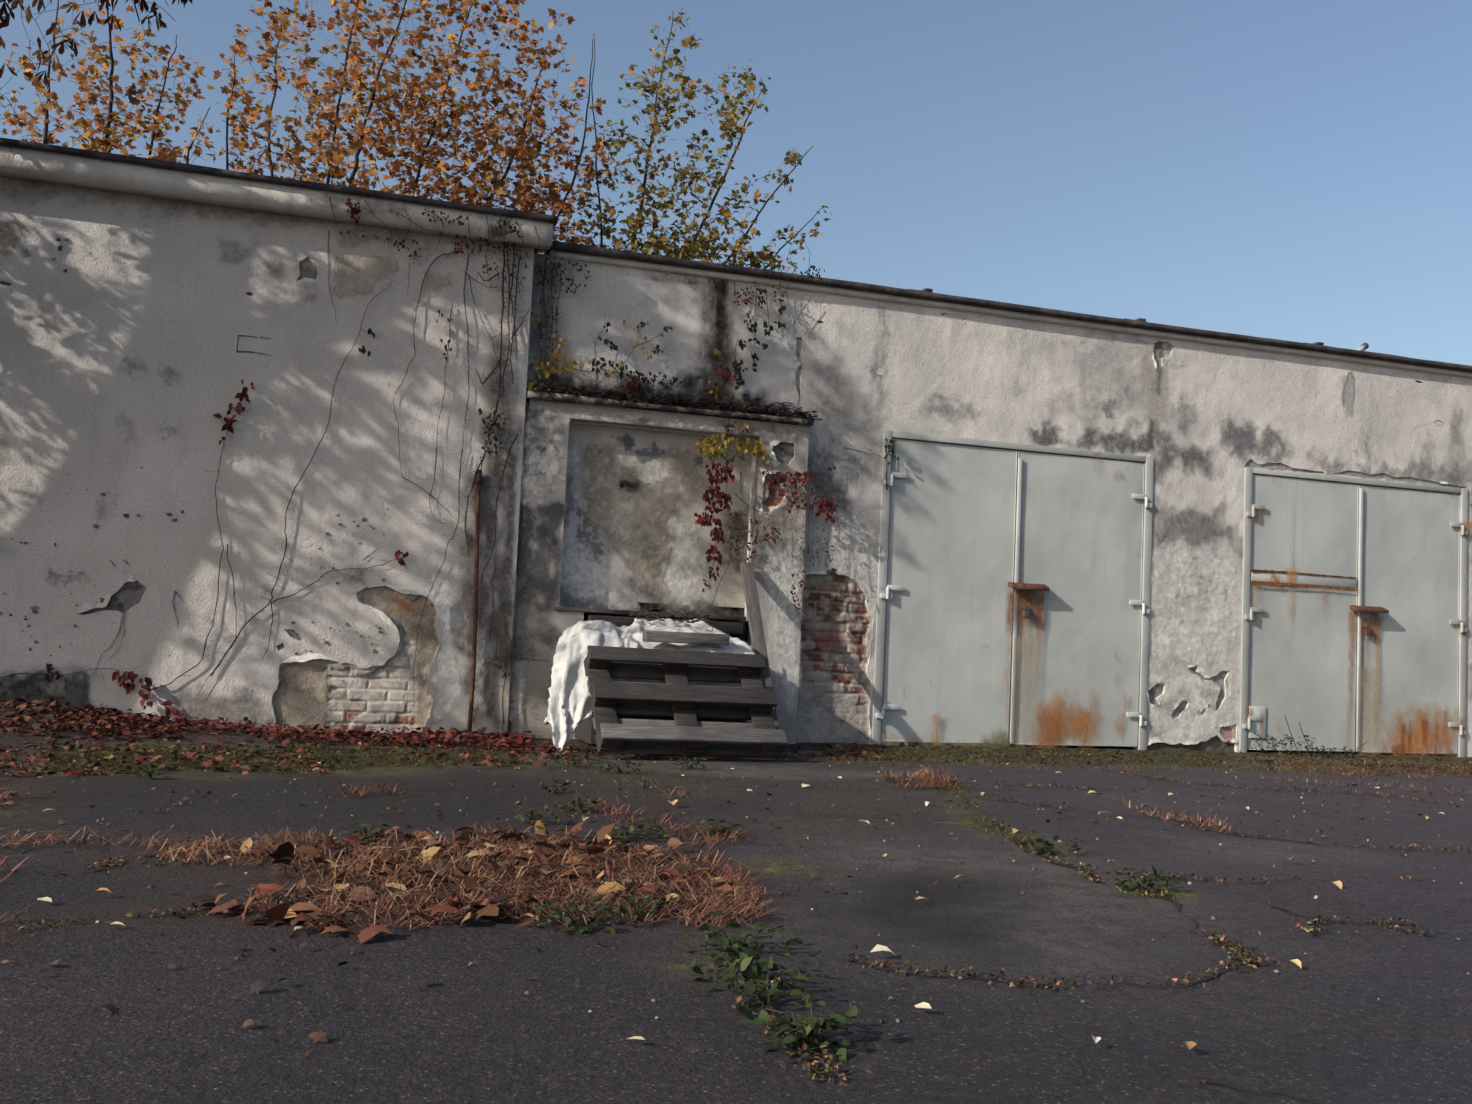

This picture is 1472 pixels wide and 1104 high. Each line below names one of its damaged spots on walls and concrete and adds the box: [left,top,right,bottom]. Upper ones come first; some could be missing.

damp [526,253,787,416]
damp [1032,422,1058,446]
damp [1080,345,1210,474]
spalling [0,574,146,656]
spalling [310,508,389,585]
flaking render [271,561,465,735]
damp [463,348,564,731]
flaking render [520,406,878,744]
rust [1008,590,1043,646]
rust [1251,569,1357,611]
rust [1036,696,1097,748]
rust [1386,707,1453,756]